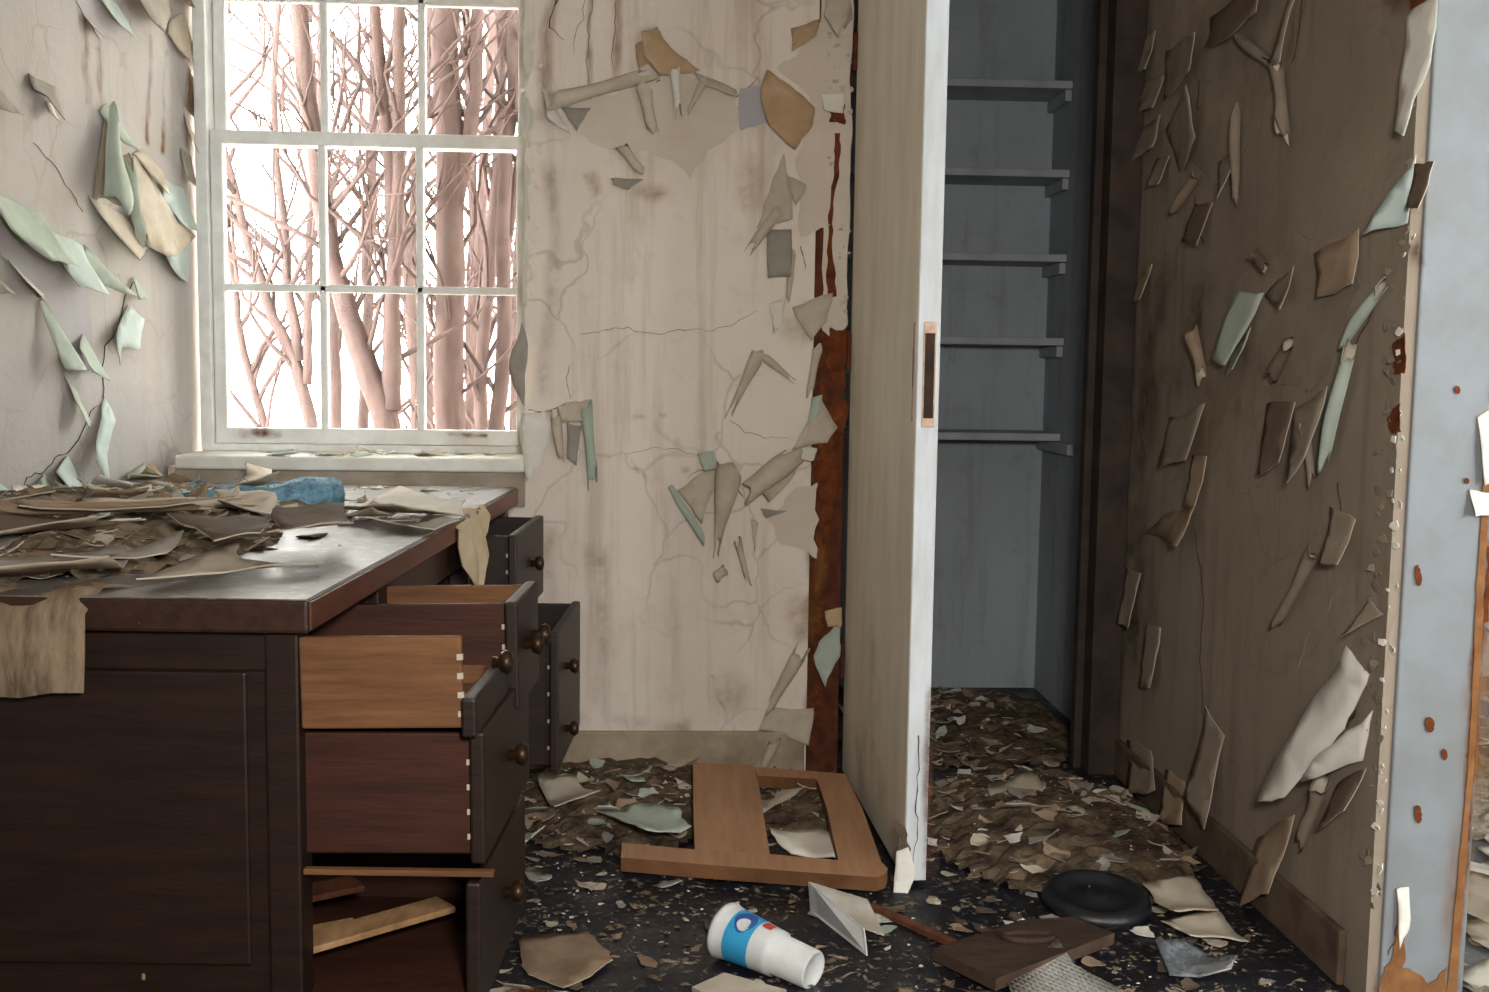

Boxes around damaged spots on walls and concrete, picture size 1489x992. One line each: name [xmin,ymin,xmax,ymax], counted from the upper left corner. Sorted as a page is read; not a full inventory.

crack [33,143,83,212]
peeling [1132,0,1303,245]
peeling [1394,0,1438,136]
peeling [509,0,853,585]
peeling [1133,264,1152,303]
peeling [1185,155,1435,489]
peeling [1469,410,1489,516]
peeling [759,607,842,768]
peeling [1116,568,1161,688]
peeling [1127,403,1225,829]
peeling [1238,601,1384,906]
peeling [1269,482,1356,631]